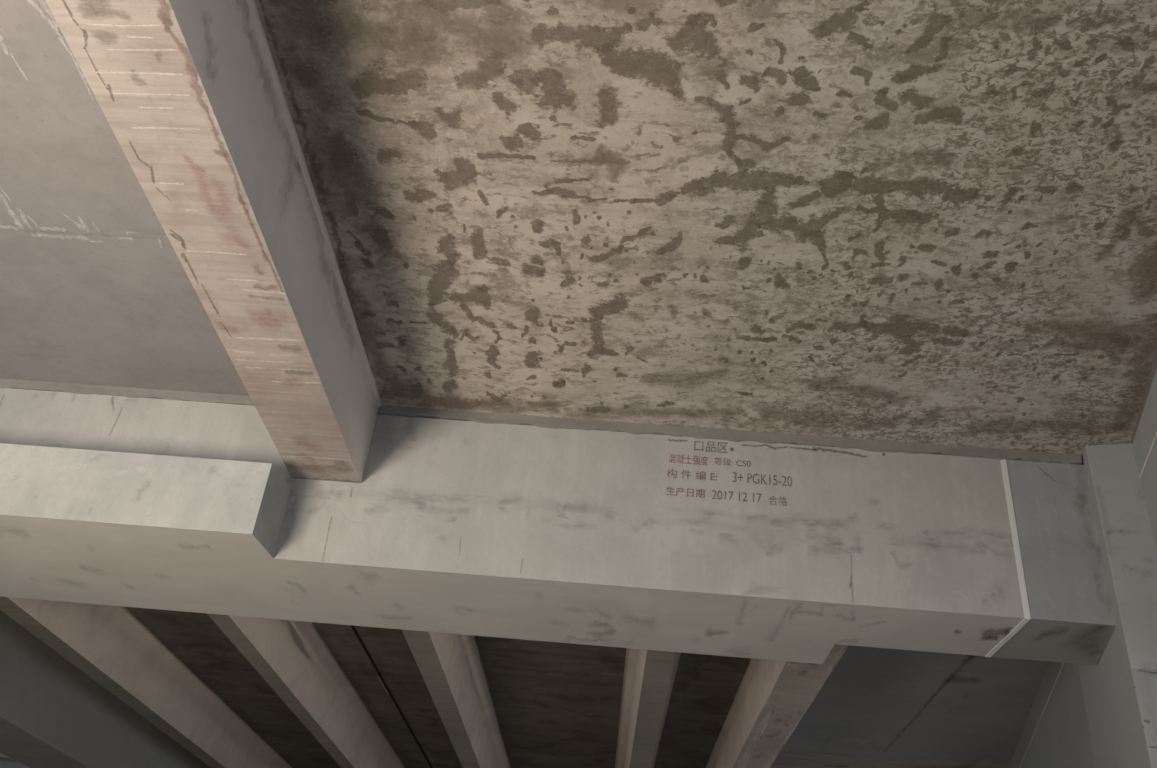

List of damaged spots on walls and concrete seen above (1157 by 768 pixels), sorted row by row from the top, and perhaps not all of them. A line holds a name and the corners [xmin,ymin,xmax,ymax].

water stain [986,0,1157,104]
water stain [1102,96,1131,128]
water stain [281,0,995,412]
water stain [1026,321,1157,431]